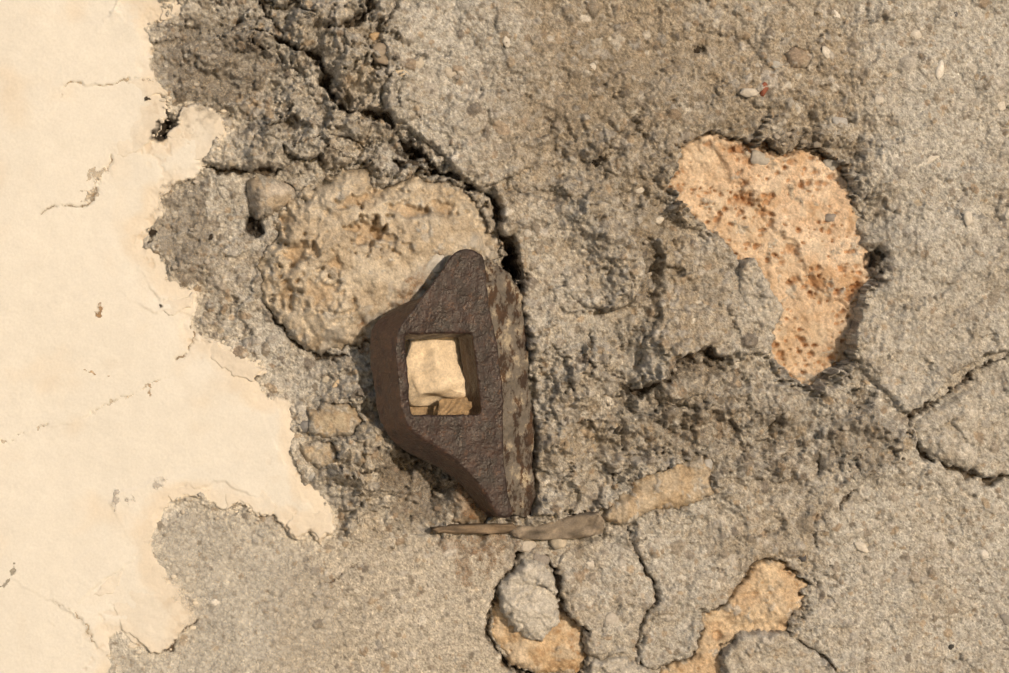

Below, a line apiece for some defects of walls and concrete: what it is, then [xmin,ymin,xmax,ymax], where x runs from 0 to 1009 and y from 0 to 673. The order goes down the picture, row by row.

spalling [117,0,281,161]
crack [203,166,278,177]
crack [250,0,523,289]
flaking render [257,168,501,356]
flaking render [666,130,875,386]
flaking render [298,402,364,469]
crack [907,351,1009,418]
crack [916,442,1009,486]
peeling [94,563,198,654]
crack [484,551,532,673]
crack [549,563,589,631]
flaking render [659,558,809,673]